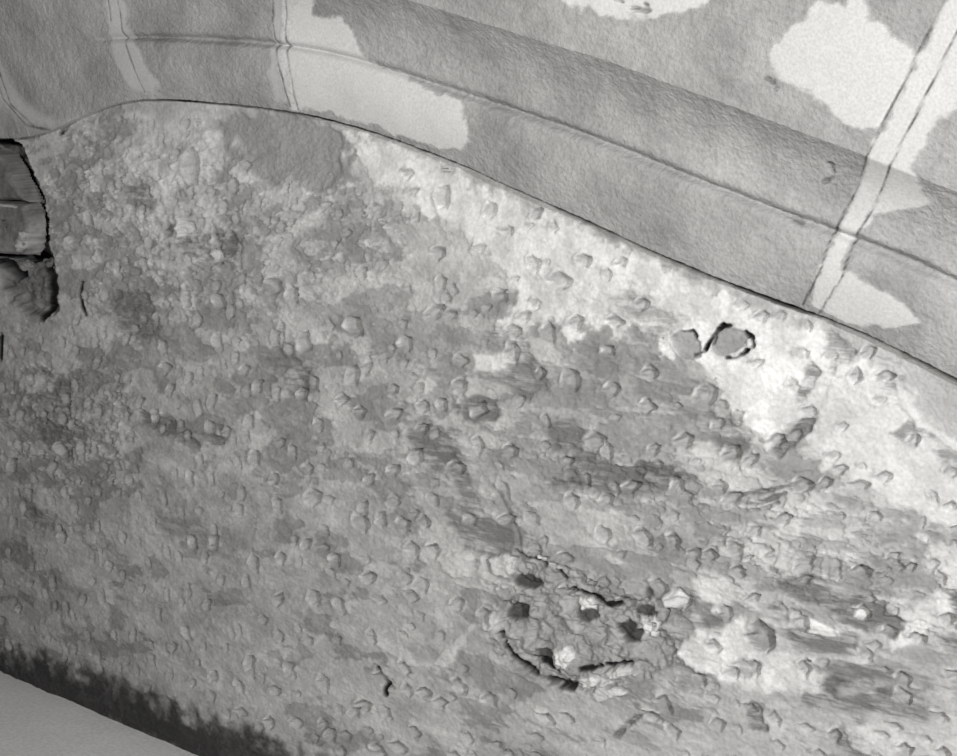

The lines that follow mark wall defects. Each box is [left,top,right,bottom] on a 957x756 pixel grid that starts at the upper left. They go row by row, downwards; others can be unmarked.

spalling [0,138,60,321]
flaking render [672,323,756,359]
peeling [457,396,499,423]
peeling [408,425,458,470]
peeling [548,421,689,503]
peeling [709,415,745,462]
spalling [763,418,815,454]
peeling [894,424,921,441]
spalling [743,479,795,517]
flaking render [475,552,692,702]
peeling [703,607,722,633]
peeling [769,562,935,718]